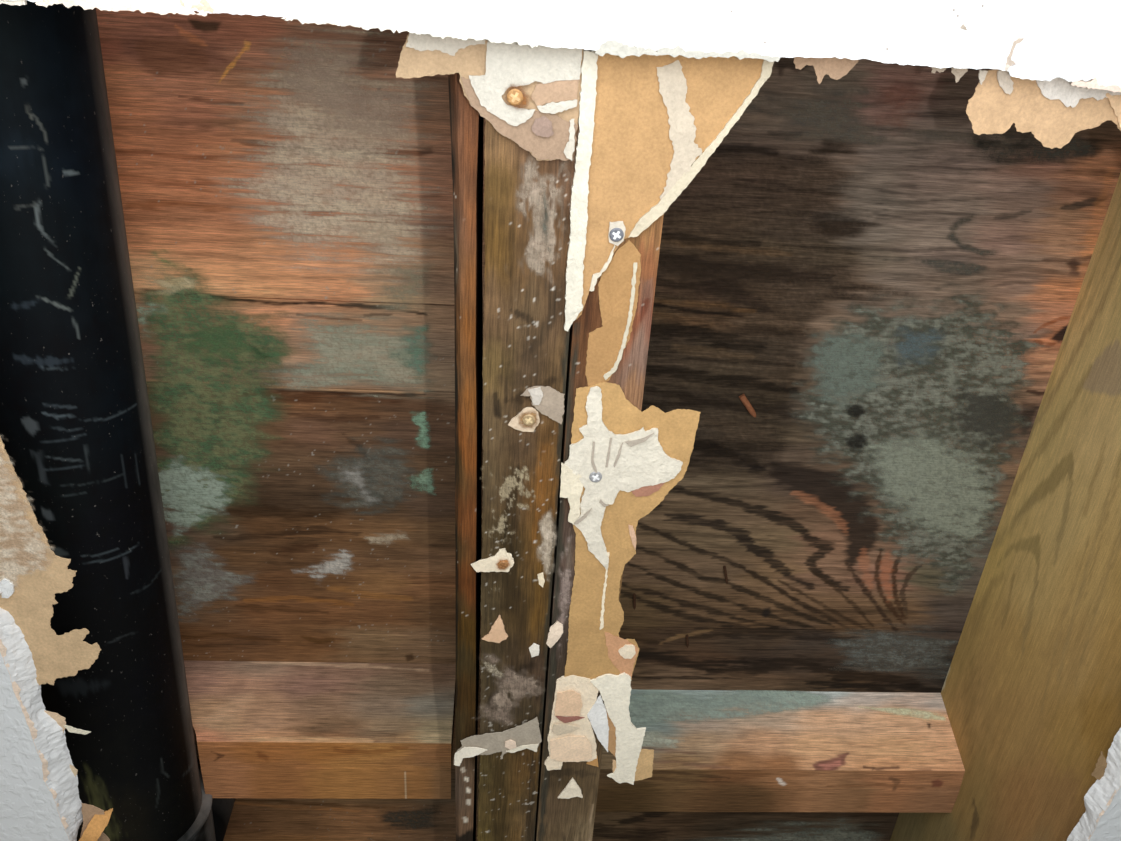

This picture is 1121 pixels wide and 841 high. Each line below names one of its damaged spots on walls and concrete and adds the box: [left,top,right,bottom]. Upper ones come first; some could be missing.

water stain [228,31,430,309]
water stain [136,268,427,612]
water stain [795,287,1037,591]
mould [629,690,827,746]